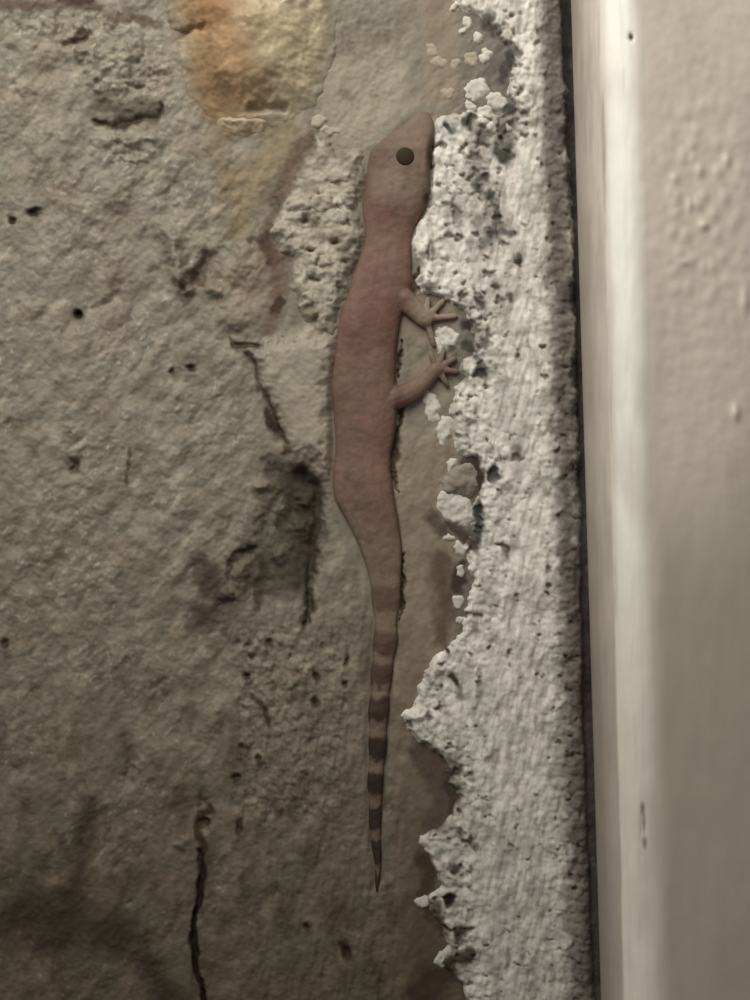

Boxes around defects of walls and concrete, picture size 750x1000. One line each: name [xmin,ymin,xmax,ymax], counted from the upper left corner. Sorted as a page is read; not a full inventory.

rust [181,0,260,122]
spalling [268,114,366,336]
crack [228,335,288,453]
water stain [192,558,239,629]
spalling [225,466,321,628]
crack [188,805,214,1000]